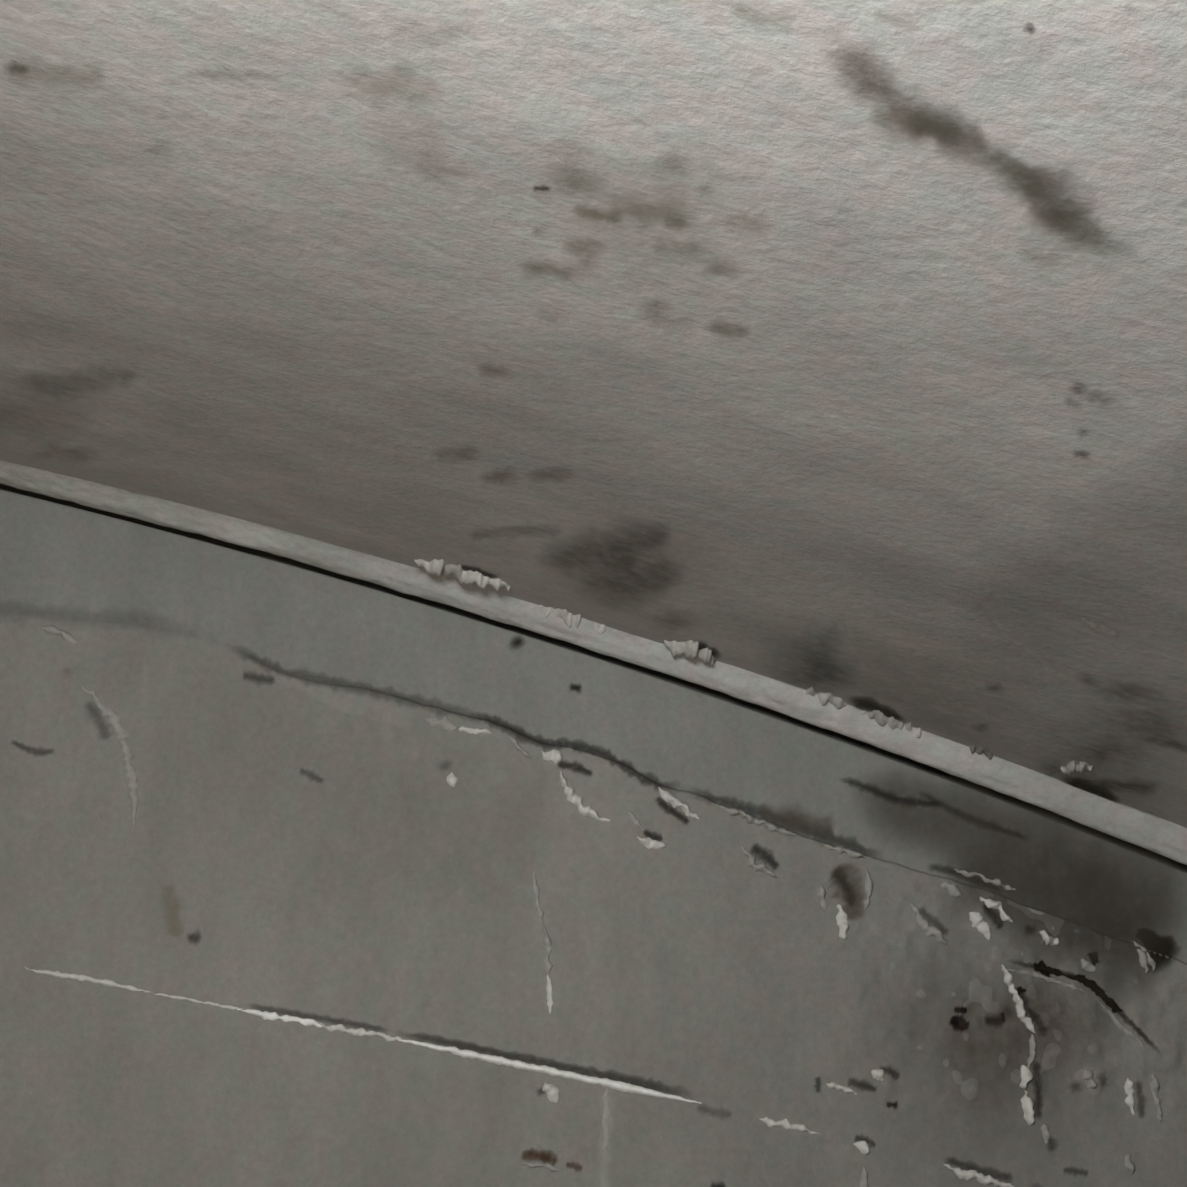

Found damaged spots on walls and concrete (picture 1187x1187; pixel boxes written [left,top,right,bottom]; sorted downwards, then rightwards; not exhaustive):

leakage [848,57,958,142]
leakage [990,151,1055,193]
flaking render [425,715,699,823]
spalling [817,843,873,940]
flaking render [935,867,1017,940]
spalling [1130,929,1175,974]
crack [25,967,701,1153]
crack [521,1150,581,1172]
crack [759,1117,819,1134]
crack [944,1164,1015,1187]
crack [1001,964,1150,1144]
flaking render [1124,1078,1135,1115]